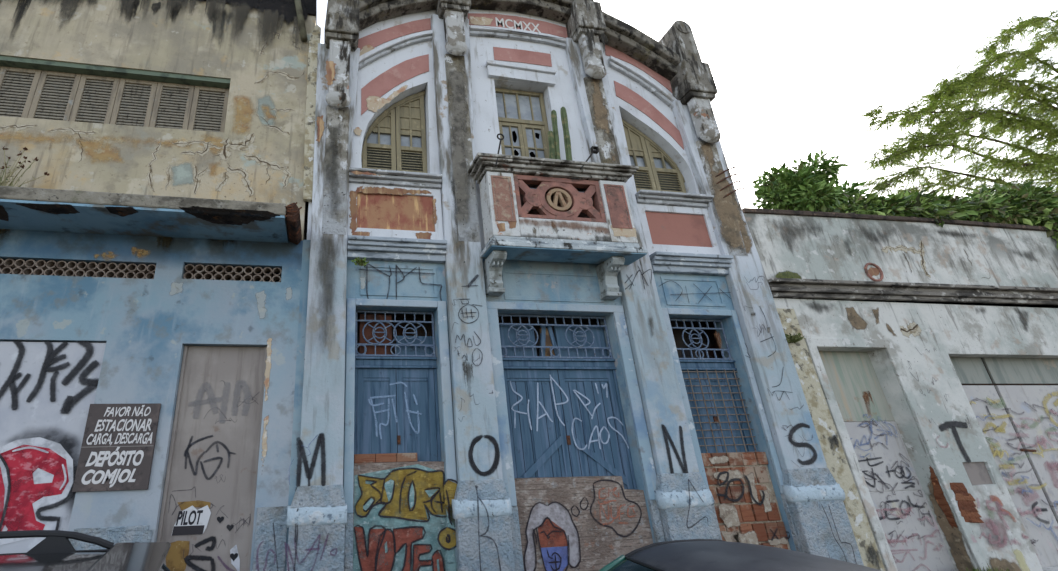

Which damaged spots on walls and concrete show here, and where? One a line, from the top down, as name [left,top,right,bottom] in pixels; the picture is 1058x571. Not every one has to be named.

damp [12,0,32,31]
damp [121,0,308,39]
crack [255,17,304,84]
spalling [0,203,80,221]
crack [147,108,293,197]
spalling [179,206,280,225]
damp [327,127,340,206]
peeling [701,143,752,253]
damp [780,226,815,249]
damp [319,238,337,337]
spalling [845,307,896,336]
spalling [928,466,984,571]